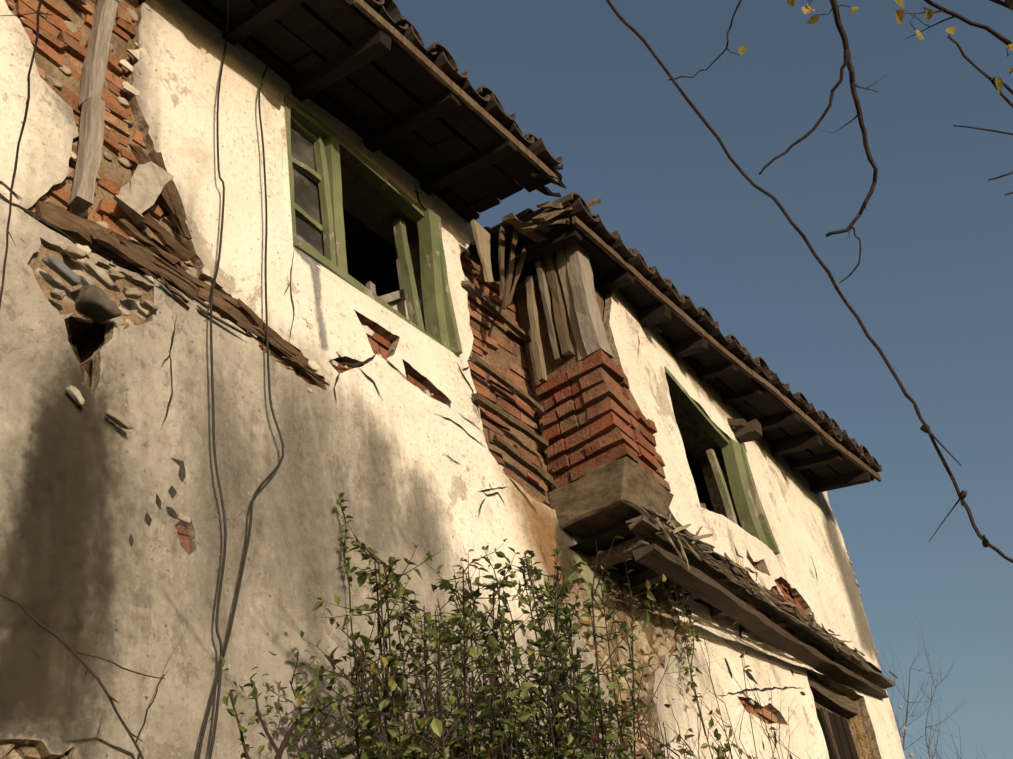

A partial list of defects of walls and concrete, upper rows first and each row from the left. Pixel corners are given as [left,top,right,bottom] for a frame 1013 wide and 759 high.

flaking render [5,0,358,405]
flaking render [360,322,395,359]
flaking render [406,375,439,401]
crack [434,363,484,446]
flaking render [460,242,552,507]
flaking render [156,458,200,555]
crack [478,471,536,514]
water stain [1,357,110,732]
flaking render [770,580,812,616]
flaking render [739,692,779,744]
flaking render [0,742,41,759]